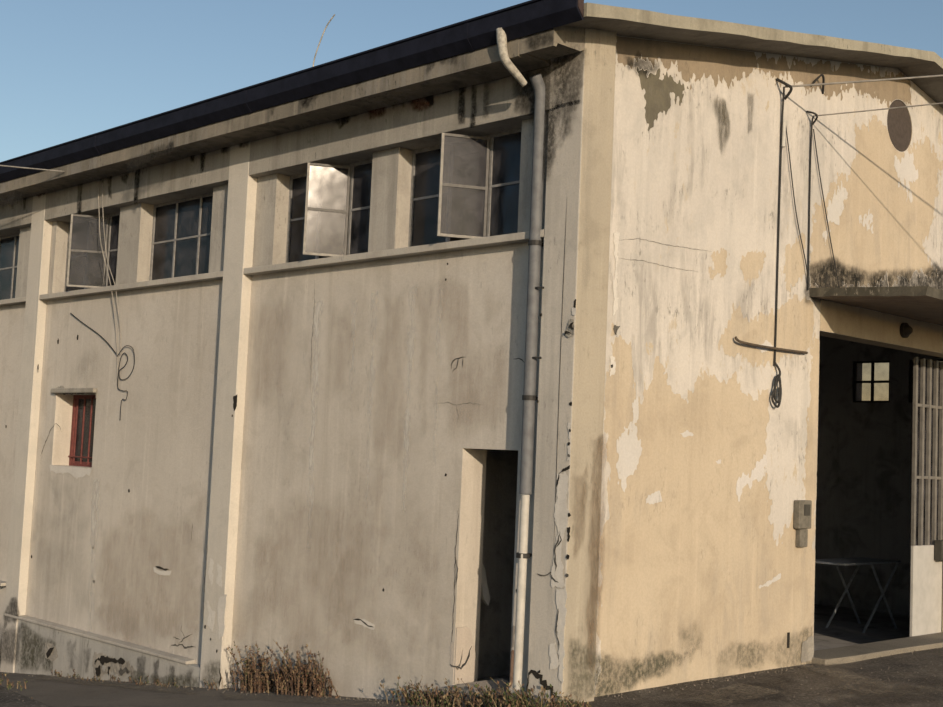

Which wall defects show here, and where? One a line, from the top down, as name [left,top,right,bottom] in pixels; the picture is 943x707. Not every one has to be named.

water stain [515,54,580,171]
water stain [716,102,729,142]
water stain [806,260,943,300]
peeling [594,36,943,697]
water stain [0,599,195,693]
spalling [92,651,134,680]
crack [171,525,208,649]
peeling [549,423,571,683]
water stain [571,491,671,697]